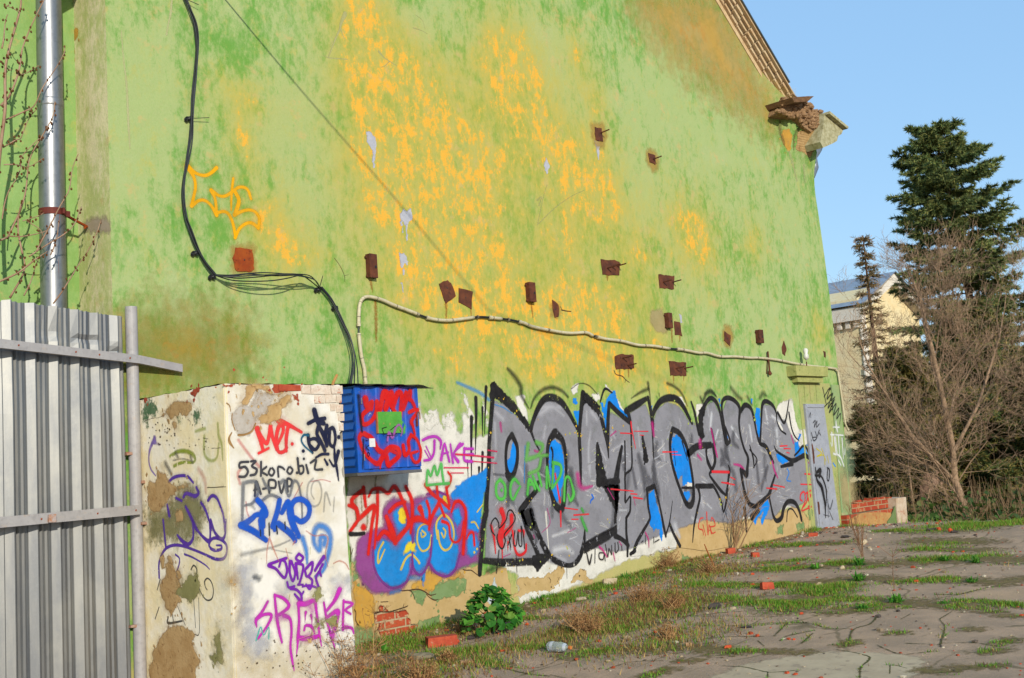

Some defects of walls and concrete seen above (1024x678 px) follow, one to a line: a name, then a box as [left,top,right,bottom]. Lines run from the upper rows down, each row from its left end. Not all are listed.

flaking render [215,368,303,431]
flaking render [144,466,188,522]
flaking render [149,555,224,678]
flaking render [264,563,594,676]